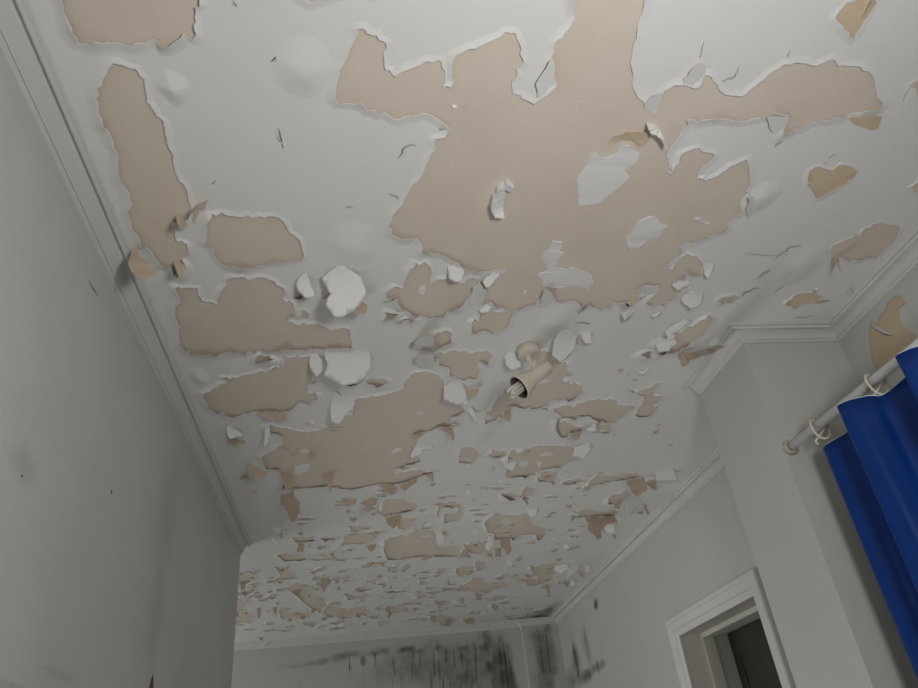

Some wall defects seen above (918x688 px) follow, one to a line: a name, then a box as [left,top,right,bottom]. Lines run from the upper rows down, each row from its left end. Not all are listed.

peeling [325,0,889,338]
peeling [824,220,905,271]
peeling [50,0,667,646]
peeling [617,291,743,381]
peeling [869,294,918,374]